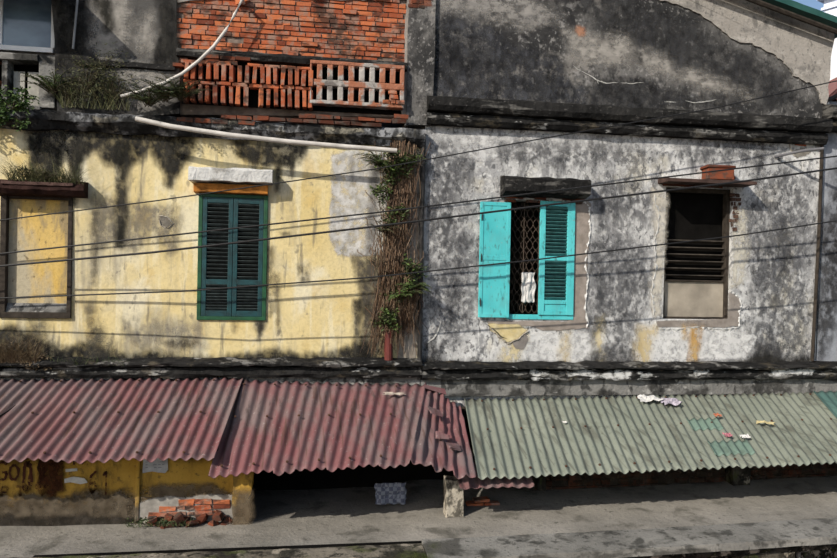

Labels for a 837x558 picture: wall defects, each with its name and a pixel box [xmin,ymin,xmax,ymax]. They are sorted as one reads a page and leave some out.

leakage [433,0,809,109]
leakage [24,130,194,251]
flaking render [486,201,640,379]
peeling [639,188,757,362]
flaking render [139,494,233,529]